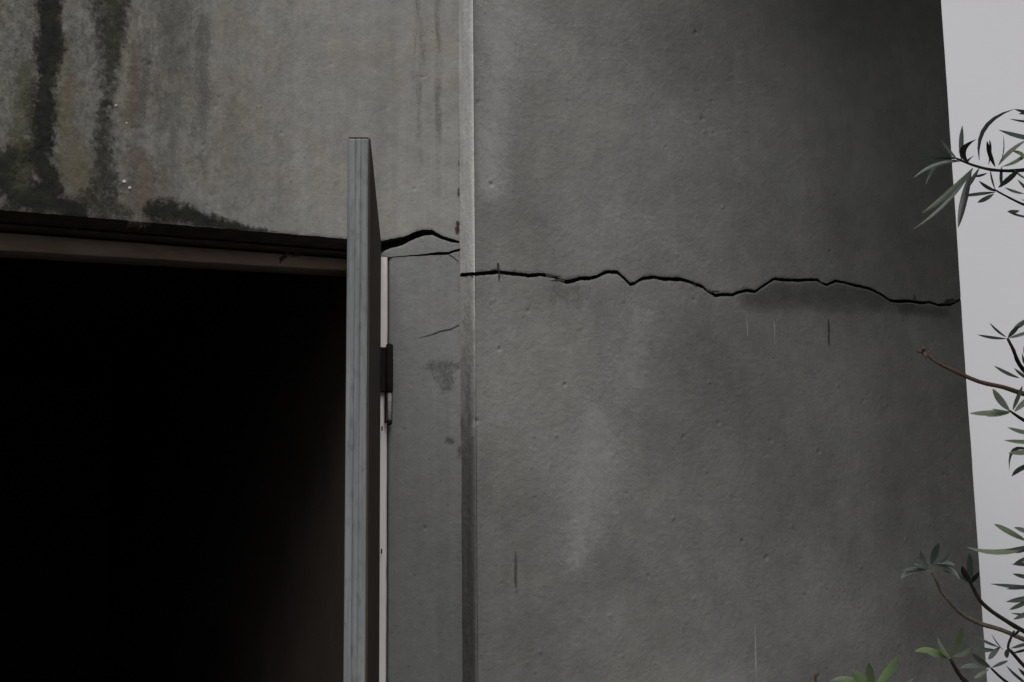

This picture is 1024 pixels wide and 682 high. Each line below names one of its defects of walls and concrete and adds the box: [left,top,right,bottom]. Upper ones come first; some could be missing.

water stain [9,0,277,232]
crack [381,229,961,307]